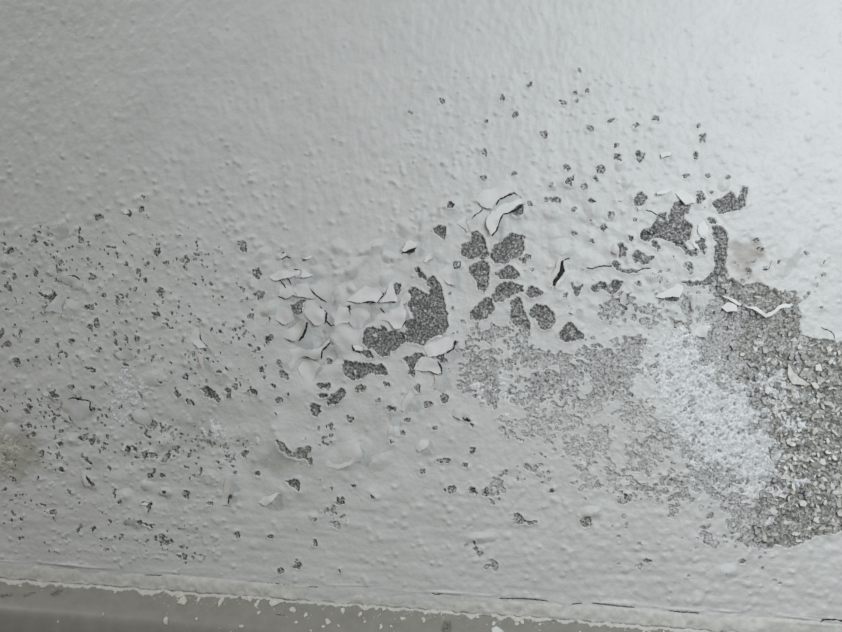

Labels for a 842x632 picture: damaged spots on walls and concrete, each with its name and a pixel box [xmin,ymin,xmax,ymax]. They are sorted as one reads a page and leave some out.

spalling [0,172,842,572]
peeling [562,164,605,203]